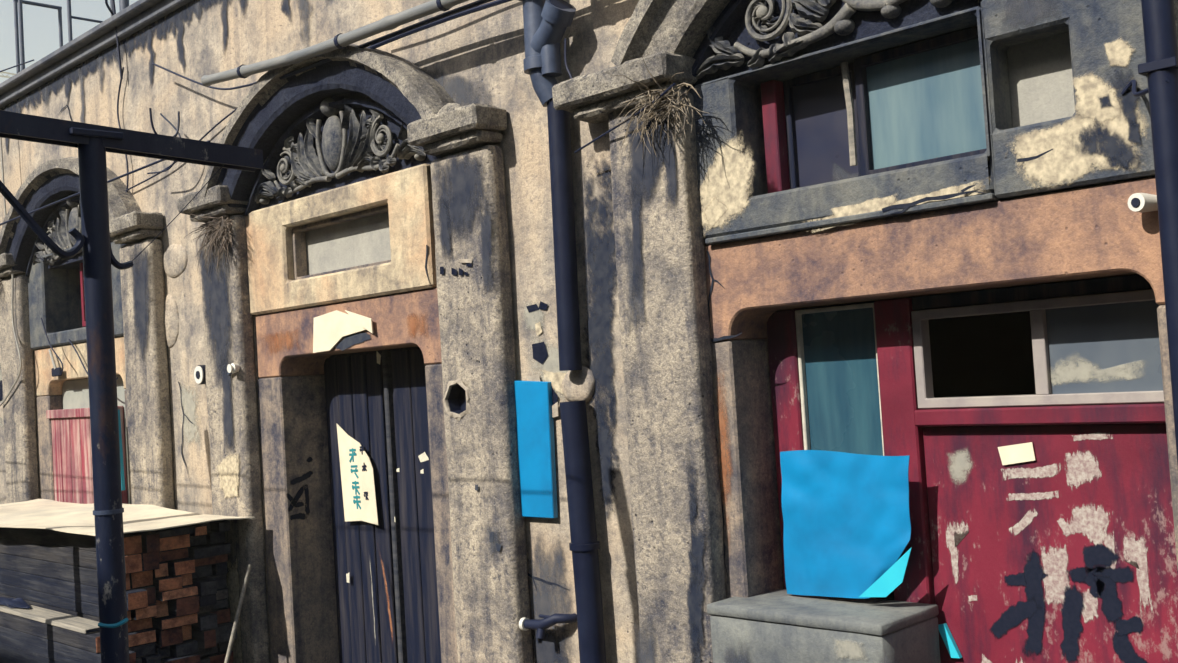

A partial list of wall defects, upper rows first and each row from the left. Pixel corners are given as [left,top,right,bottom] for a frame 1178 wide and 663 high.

water stain [281,0,311,46]
water stain [0,0,247,123]
water stain [423,69,487,106]
peeling [1012,39,1145,187]
water stain [436,154,493,291]
peeling [699,138,754,230]
peeling [807,181,984,232]
crack [882,185,984,214]
water stain [582,107,676,518]
peeling [1067,504,1110,545]
water stain [637,627,655,663]